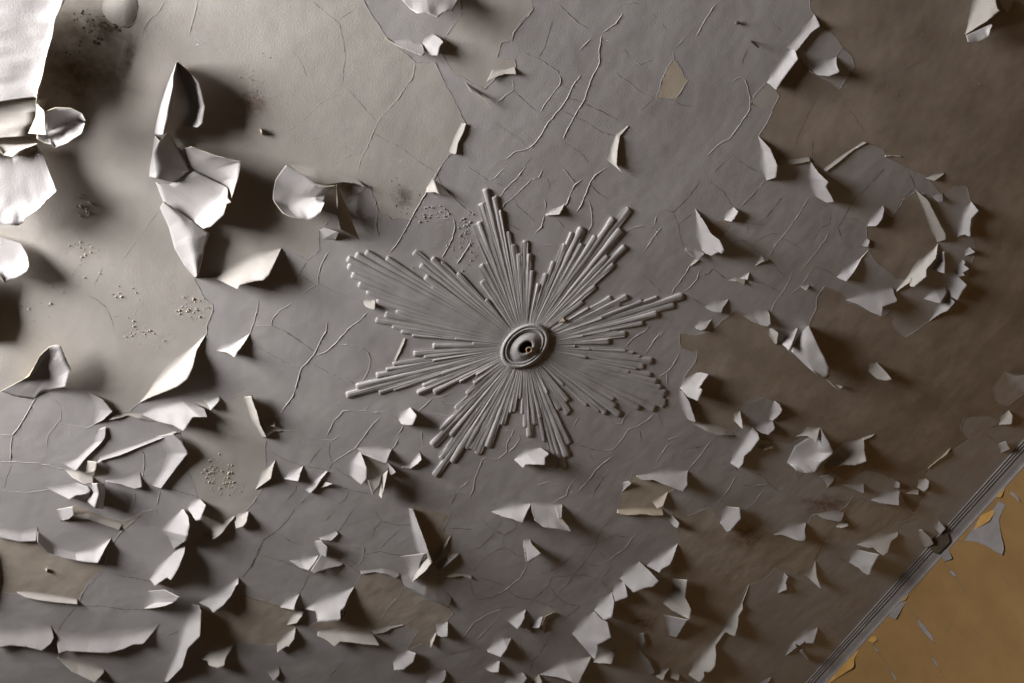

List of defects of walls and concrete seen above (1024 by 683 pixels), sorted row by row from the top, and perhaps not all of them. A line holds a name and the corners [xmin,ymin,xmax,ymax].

crack [315,1,719,264]
crack [0,392,64,493]
peeling [0,623,159,683]
crack [58,447,197,631]
peeling [0,0,533,609]
peeling [164,504,472,683]
crack [235,250,455,608]
peeling [483,0,1024,683]